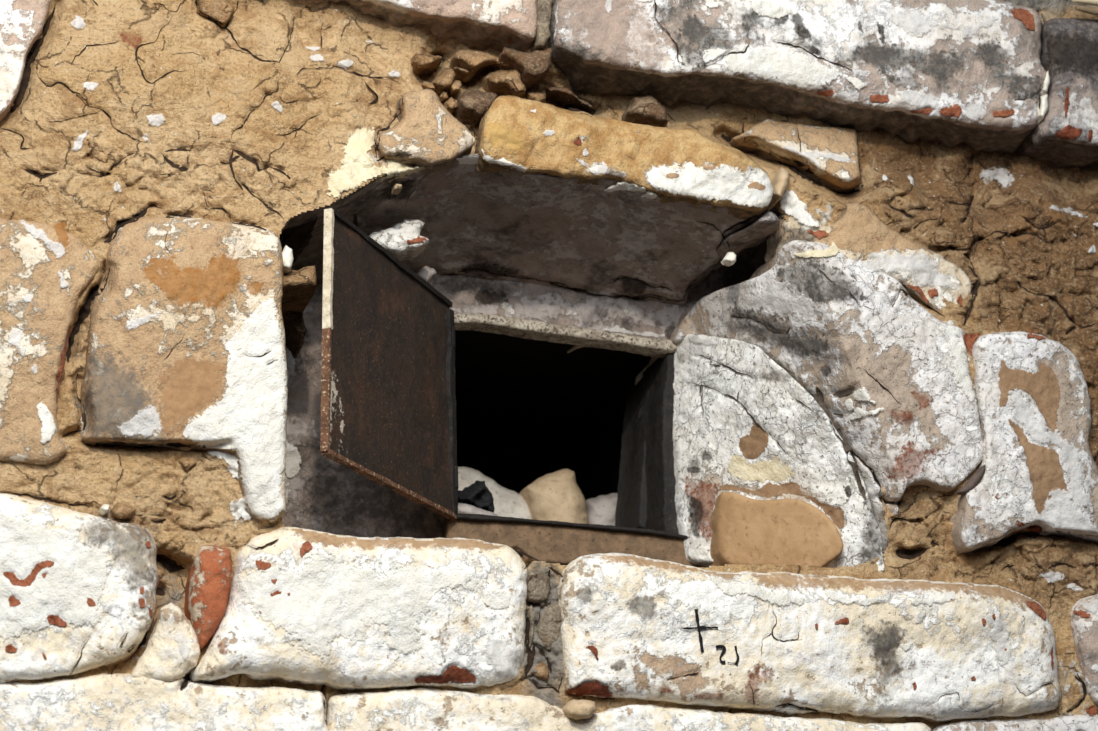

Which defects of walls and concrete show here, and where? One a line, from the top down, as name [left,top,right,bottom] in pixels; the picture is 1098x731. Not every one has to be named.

crack [654,0,853,71]
crack [1,128,57,182]
crack [37,0,412,248]
crack [809,153,1059,325]
crack [1017,282,1095,334]
peeling [117,295,302,522]
rust [320,328,332,452]
crack [686,354,803,465]
peeling [739,424,769,459]
peeling [719,482,844,536]
crack [787,369,940,530]
peeling [998,359,1098,537]